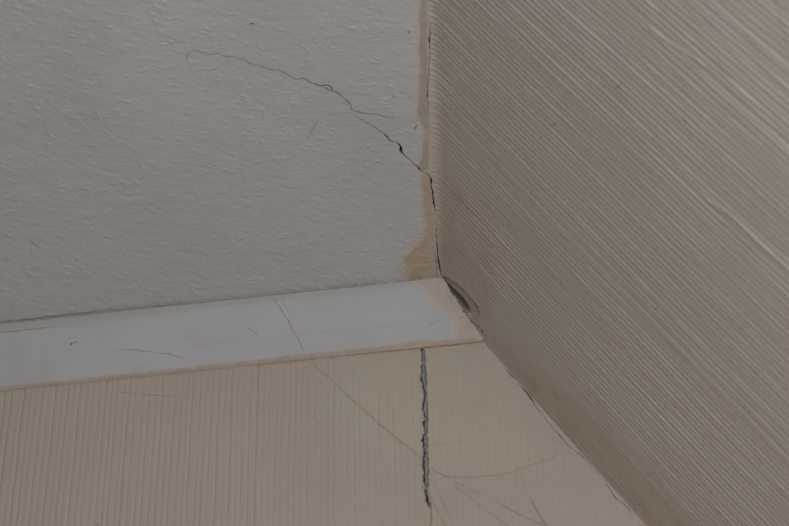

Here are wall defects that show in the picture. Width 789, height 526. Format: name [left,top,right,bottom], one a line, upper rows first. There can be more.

crack [249,63,436,212]
crack [346,342,478,525]
crack [507,371,583,457]